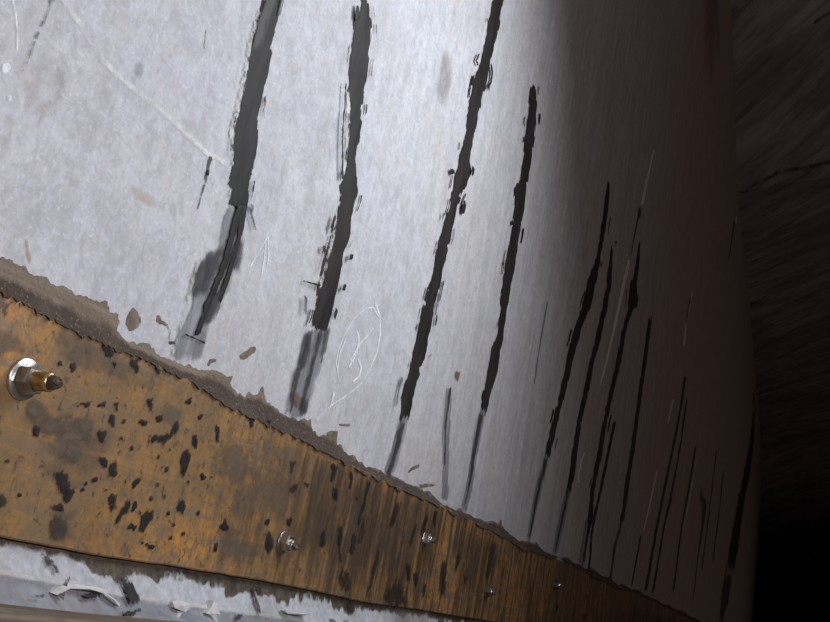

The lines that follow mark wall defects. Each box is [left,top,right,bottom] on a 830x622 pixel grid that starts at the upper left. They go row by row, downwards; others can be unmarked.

peeling [126,307,141,331]
peeling [240,347,256,360]
peeling [139,398,163,426]
peeling [100,457,141,488]
peeling [49,582,120,607]
peeling [169,599,191,618]